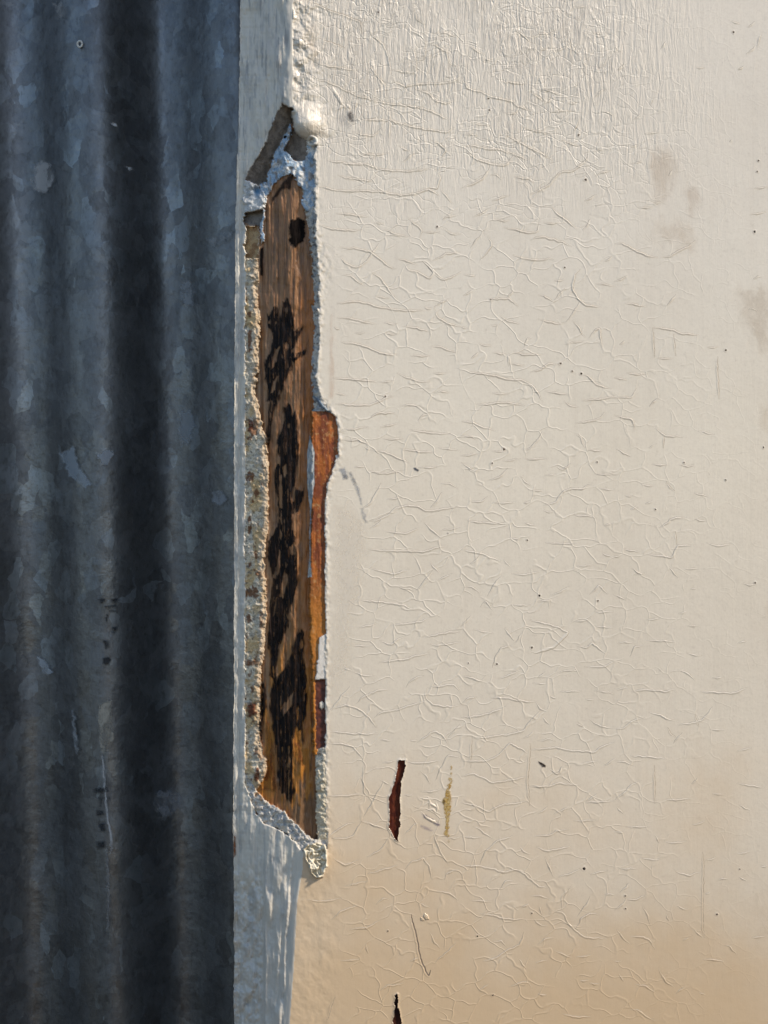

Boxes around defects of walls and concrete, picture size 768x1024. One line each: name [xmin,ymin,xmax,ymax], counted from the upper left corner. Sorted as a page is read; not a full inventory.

spalling [242,104,339,879]
spalling [389,760,406,841]
spalling [393,994,402,1024]
crack [307,1,765,1022]